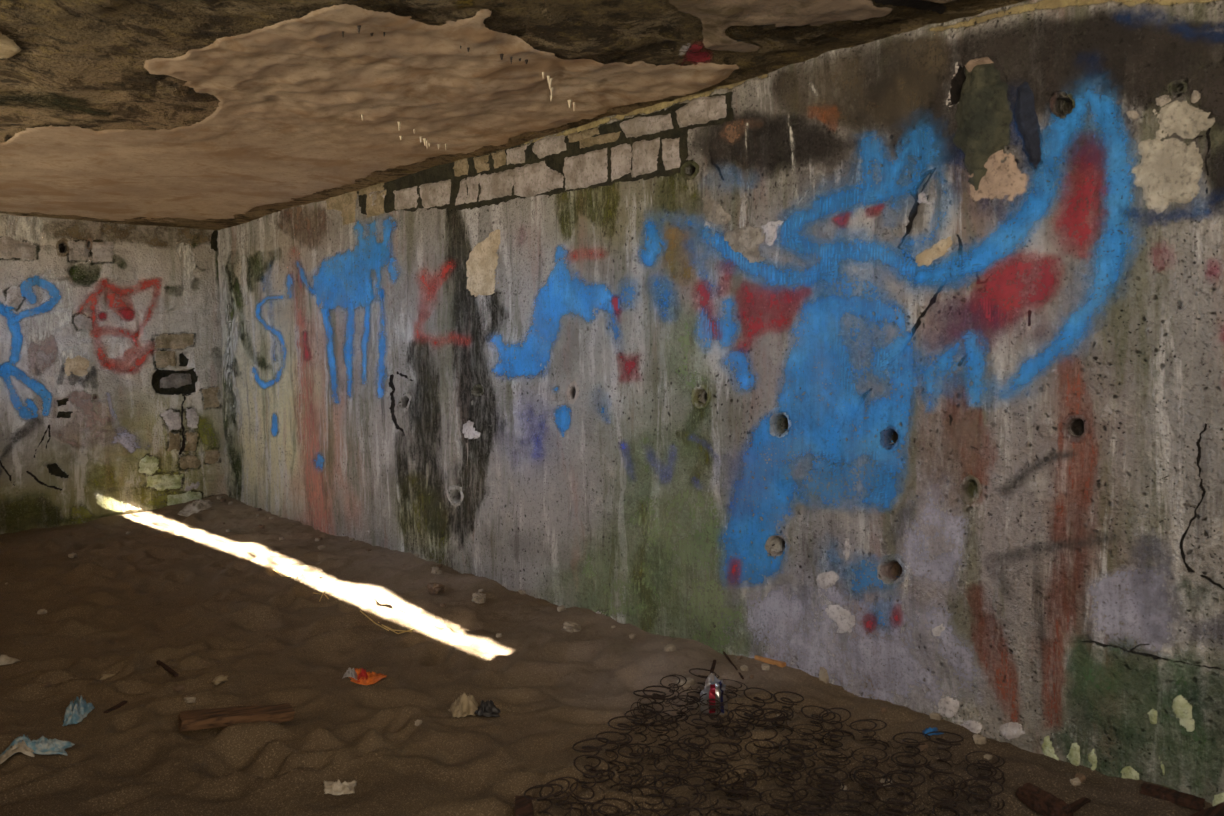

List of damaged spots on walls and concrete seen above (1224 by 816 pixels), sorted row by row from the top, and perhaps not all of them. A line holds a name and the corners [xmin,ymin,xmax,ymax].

peeling [0,0,892,252]
spalling [968,150,1030,202]
peeling [1156,95,1171,107]
damp [395,207,508,551]
crack [1179,423,1224,590]